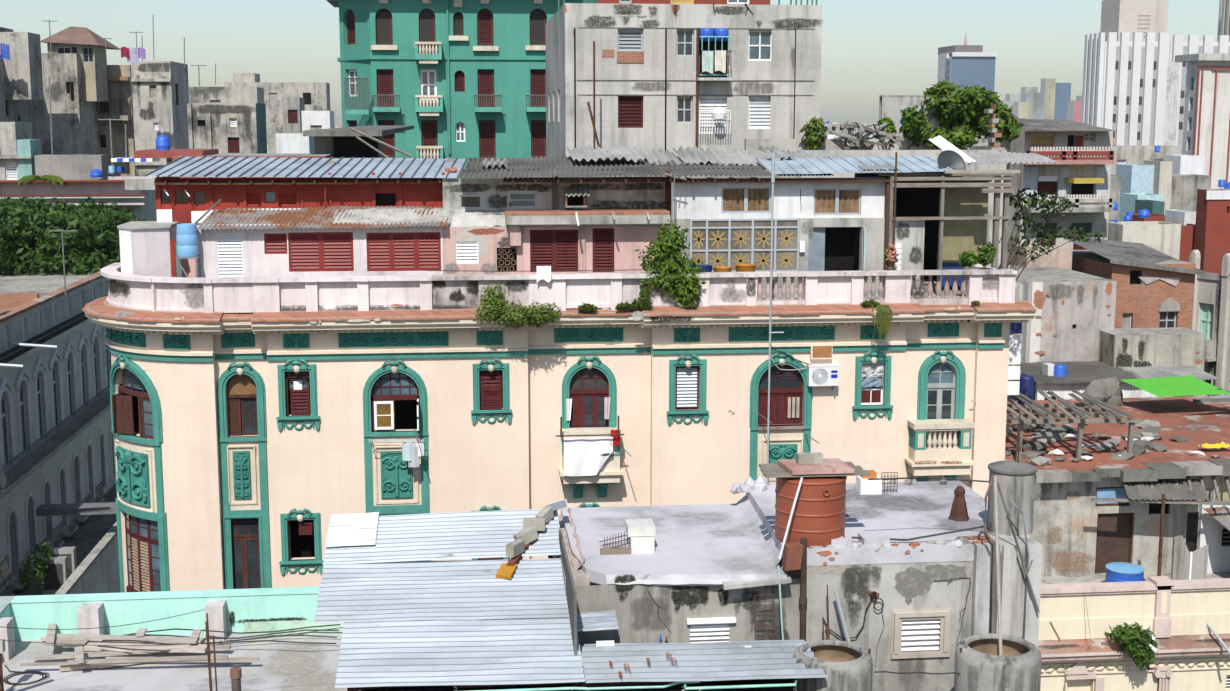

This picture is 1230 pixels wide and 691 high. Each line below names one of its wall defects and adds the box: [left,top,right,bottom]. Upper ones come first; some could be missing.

peeling [809,537,988,605]
damp [615,575,789,641]